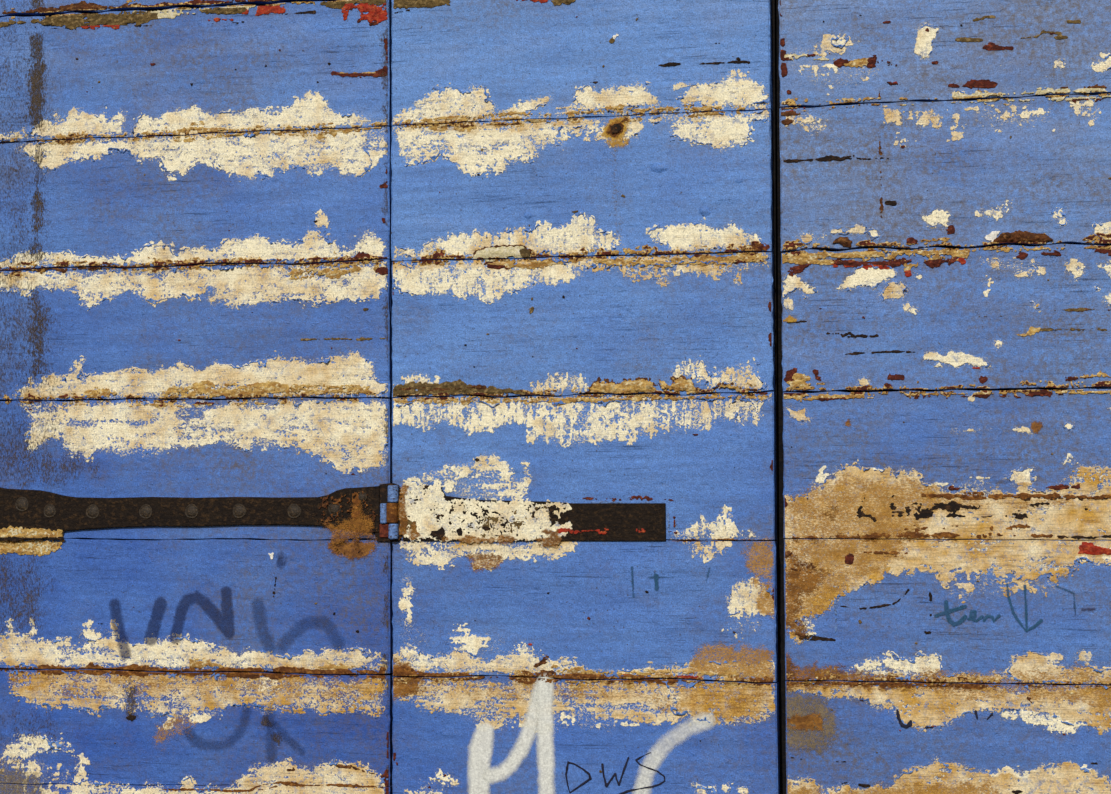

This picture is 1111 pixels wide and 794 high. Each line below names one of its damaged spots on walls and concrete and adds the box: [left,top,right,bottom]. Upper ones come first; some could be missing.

peeling [0,0,451,30]
corrosion [380,1,388,151]
peeling [0,21,1111,221]
corrosion [602,117,629,160]
peeling [0,207,1111,315]
peeling [3,347,1111,475]
corrosion [317,491,388,572]
peeling [0,453,1111,735]
peeling [0,733,388,794]
corrosion [381,732,389,794]
peeling [404,769,459,794]
peeling [787,758,1111,794]